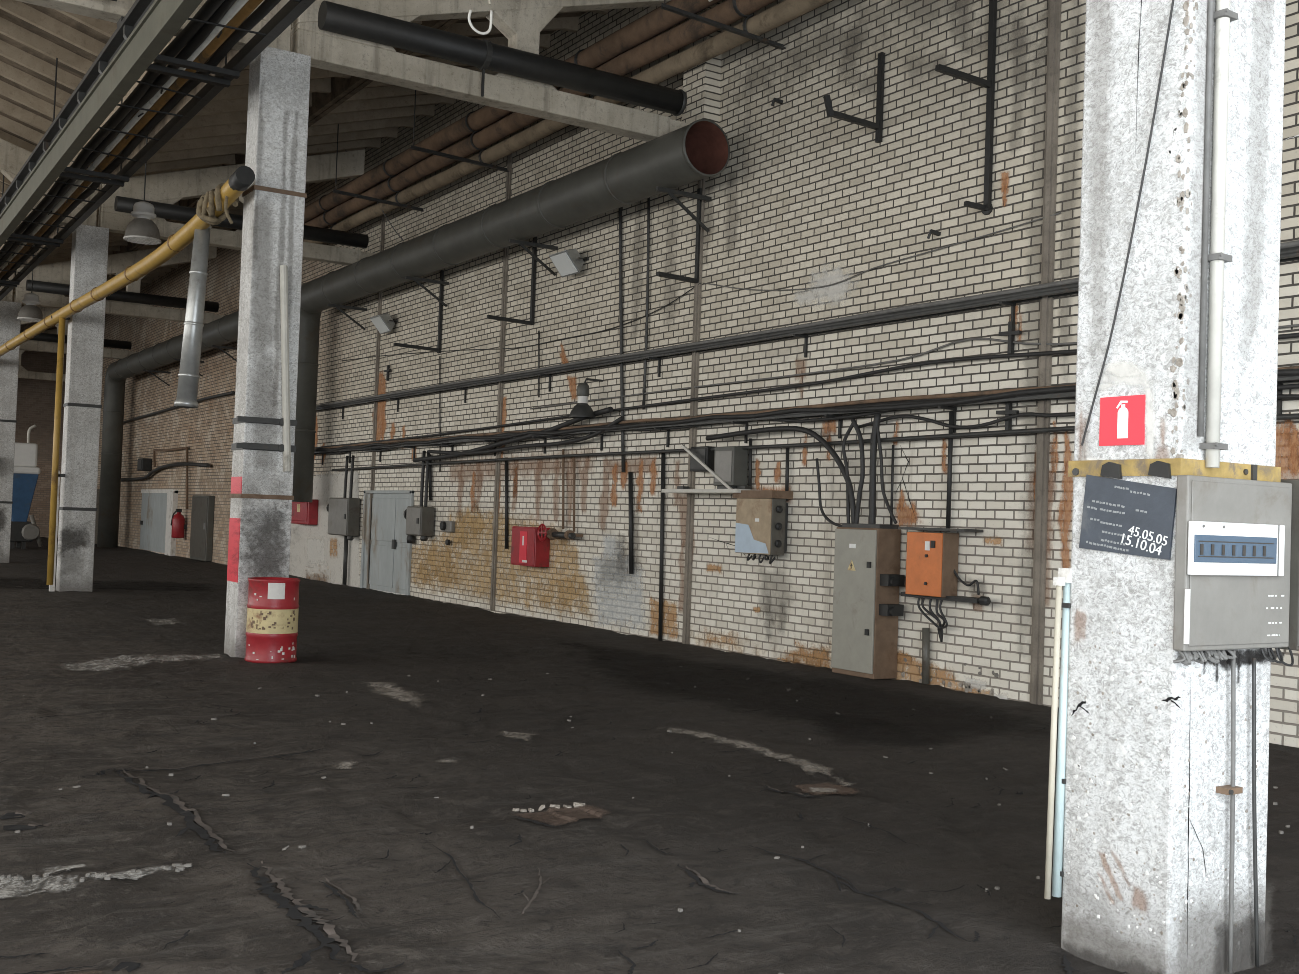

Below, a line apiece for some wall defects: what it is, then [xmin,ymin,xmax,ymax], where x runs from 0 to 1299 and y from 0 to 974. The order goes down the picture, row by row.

rust [560,345,576,399]
rust [372,373,416,459]
rust [610,460,657,512]
rust [752,459,790,491]
peeling [411,508,588,613]
crack [82,747,404,974]